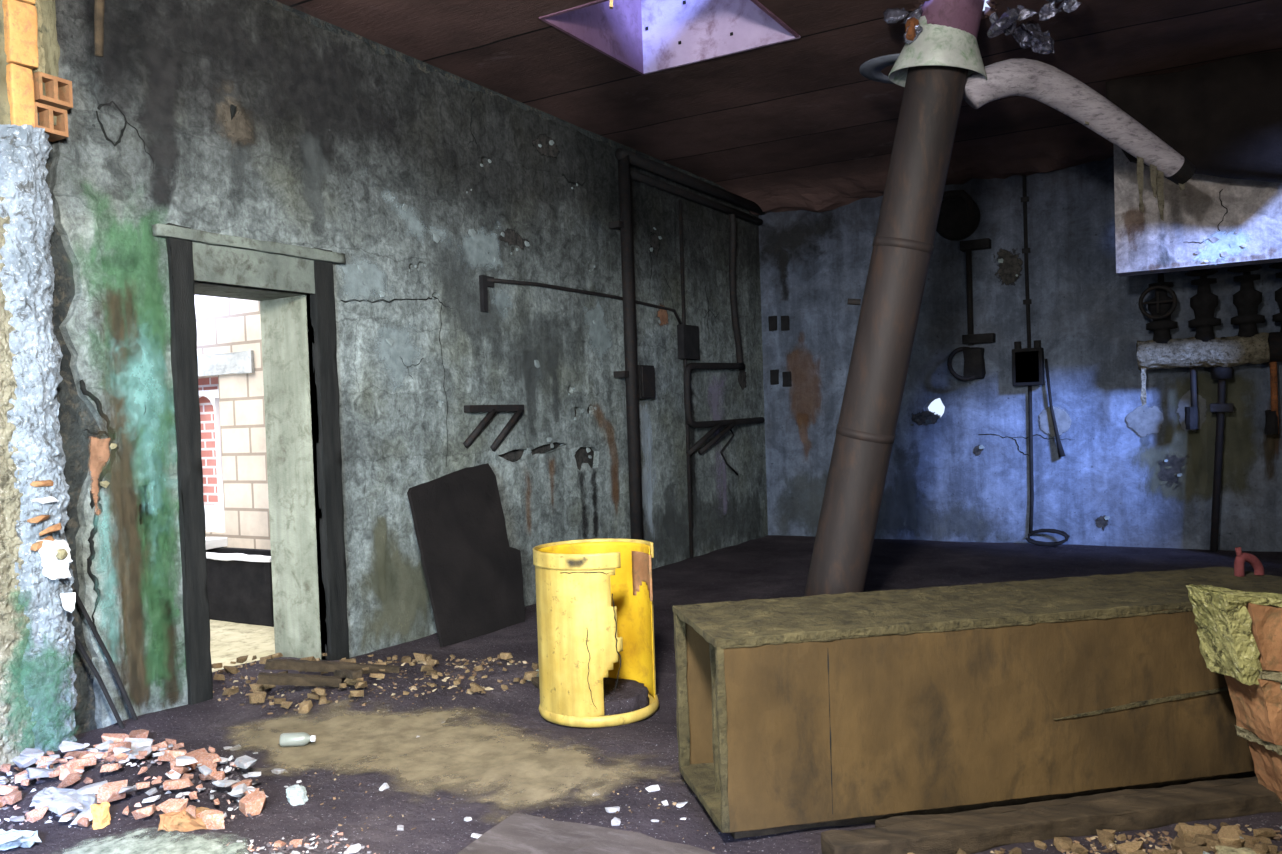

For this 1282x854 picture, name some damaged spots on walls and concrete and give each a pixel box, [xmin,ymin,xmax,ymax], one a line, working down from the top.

crack [96,100,154,175]
crack [79,379,118,637]
water stain [100,289,179,707]